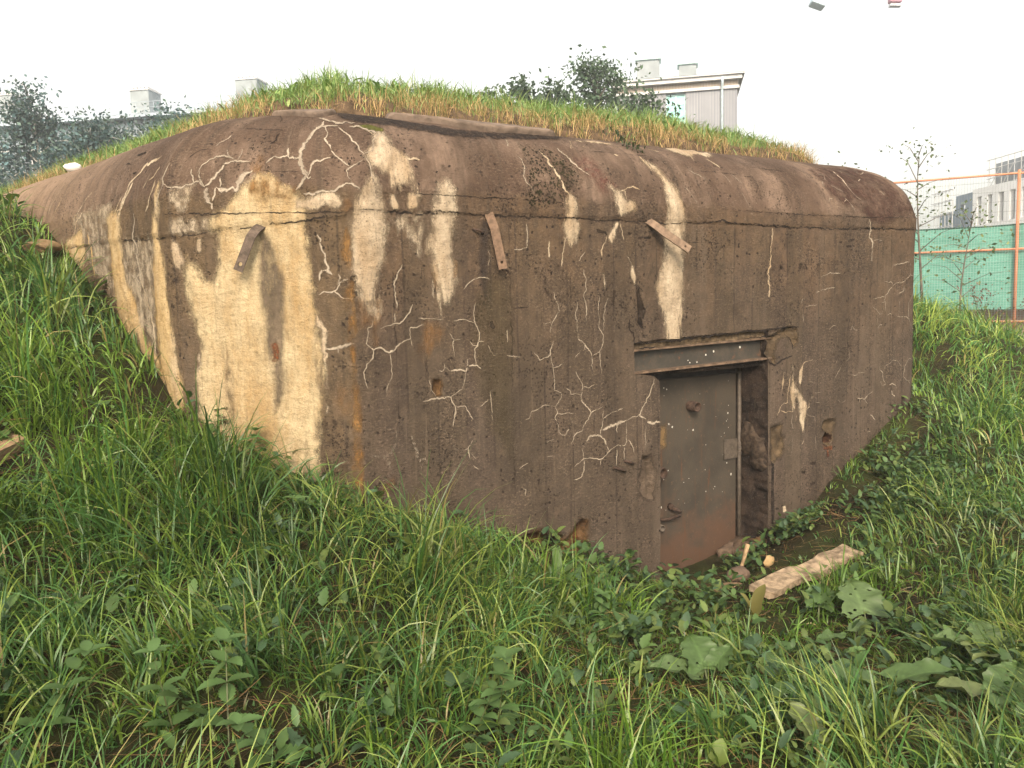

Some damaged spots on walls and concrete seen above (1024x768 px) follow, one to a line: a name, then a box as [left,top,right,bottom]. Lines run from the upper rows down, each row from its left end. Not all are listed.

leakage [63,158,350,482]
crack [112,116,379,282]
leakage [337,113,618,320]
crack [325,224,660,495]
leakage [639,145,719,339]
leakage [777,360,811,444]
spalling [522,519,589,558]